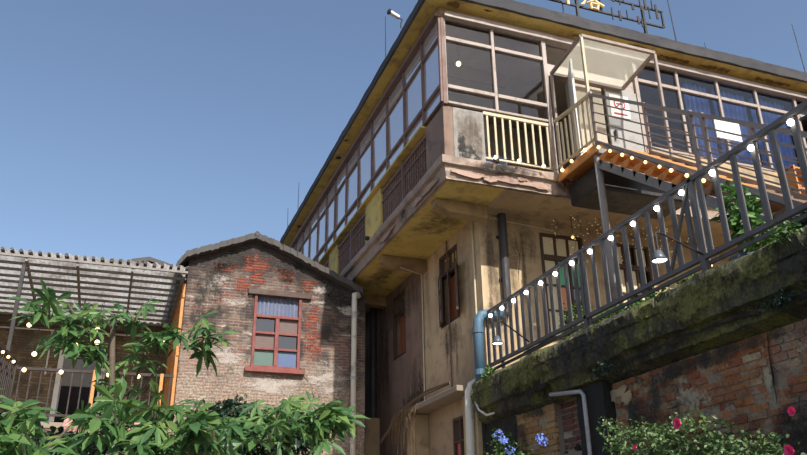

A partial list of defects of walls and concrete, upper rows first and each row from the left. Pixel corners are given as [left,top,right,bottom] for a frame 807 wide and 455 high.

water stain [458,117,537,176]
peeling [610,385,632,405]
crack [766,330,780,402]